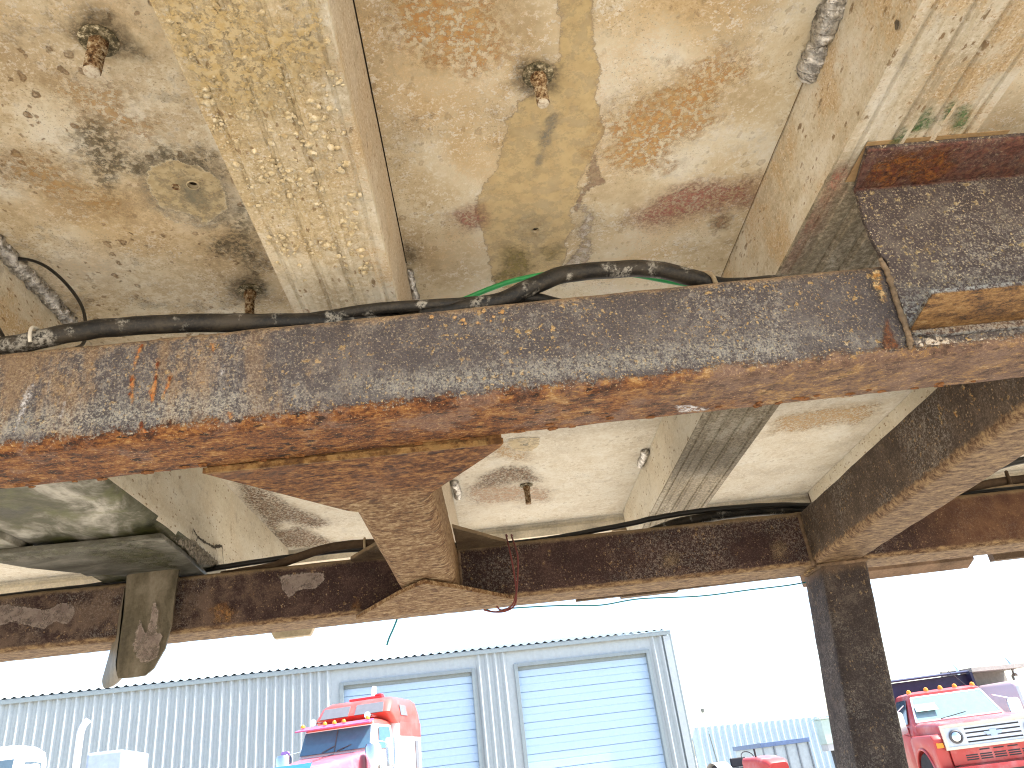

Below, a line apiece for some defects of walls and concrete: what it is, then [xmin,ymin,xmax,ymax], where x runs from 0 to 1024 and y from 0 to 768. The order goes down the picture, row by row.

rust [605,59,747,169]
leakage [475,0,605,288]
leakage [81,126,267,268]
rust [872,270,887,302]
rust [128,344,143,400]
rust [149,361,172,402]
rust [774,396,878,432]
leakage [467,467,547,503]
peeling [280,572,324,597]
peeling [0,603,75,628]
peeling [133,602,163,663]